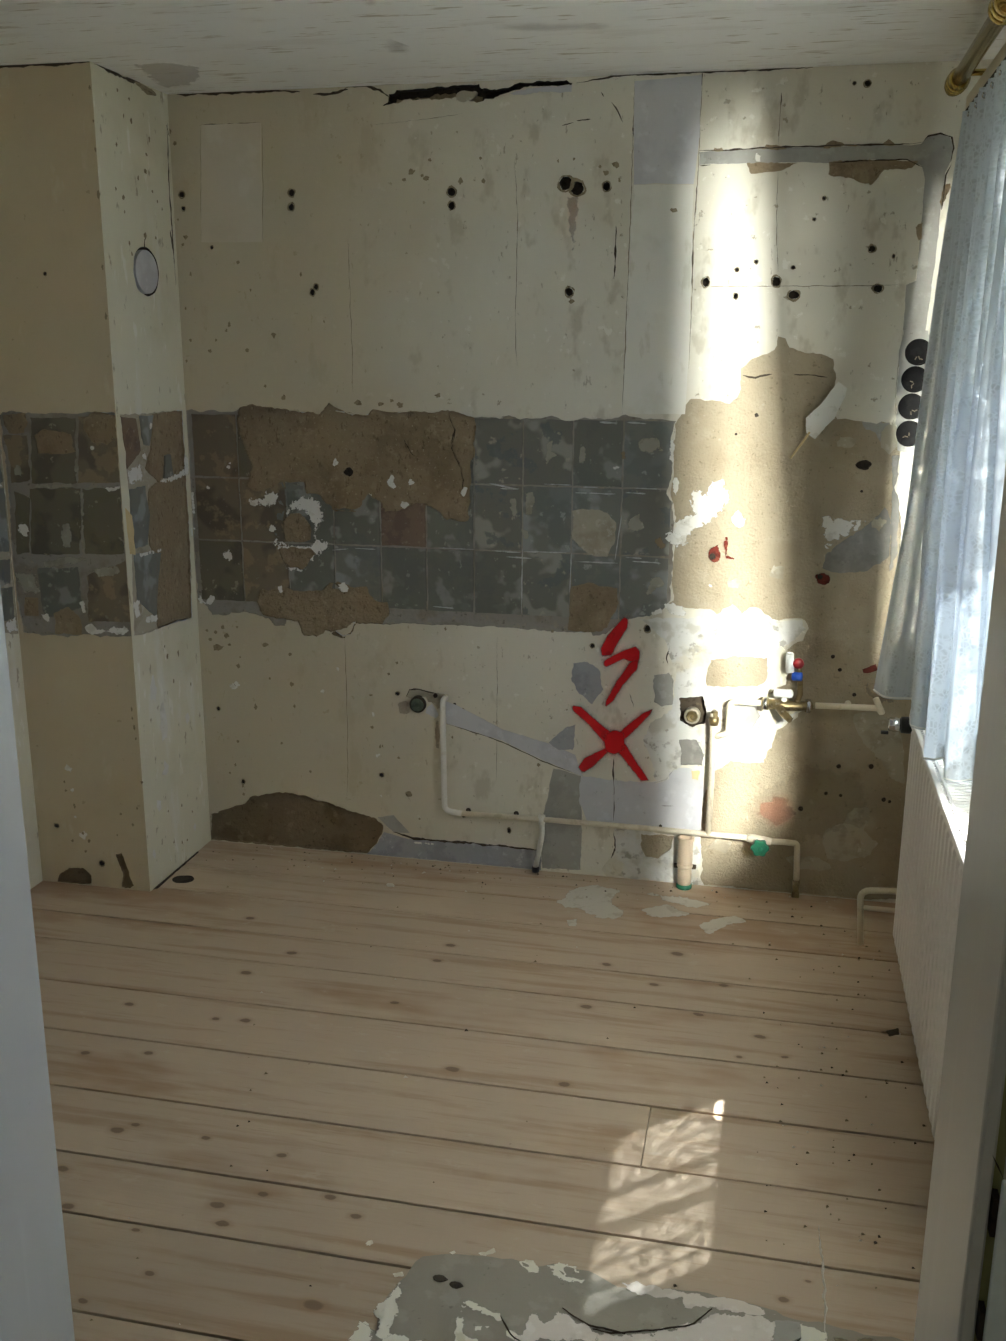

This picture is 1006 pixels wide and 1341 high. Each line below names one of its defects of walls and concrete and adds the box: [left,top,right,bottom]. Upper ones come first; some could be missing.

crack [0,61,955,406]
flaking render [35,459,85,549]
flaking render [79,411,215,635]
spalling [237,393,476,522]
spalling [257,582,389,638]
spalling [602,336,911,900]
spalling [211,763,383,853]
crack [562,1307,712,1334]